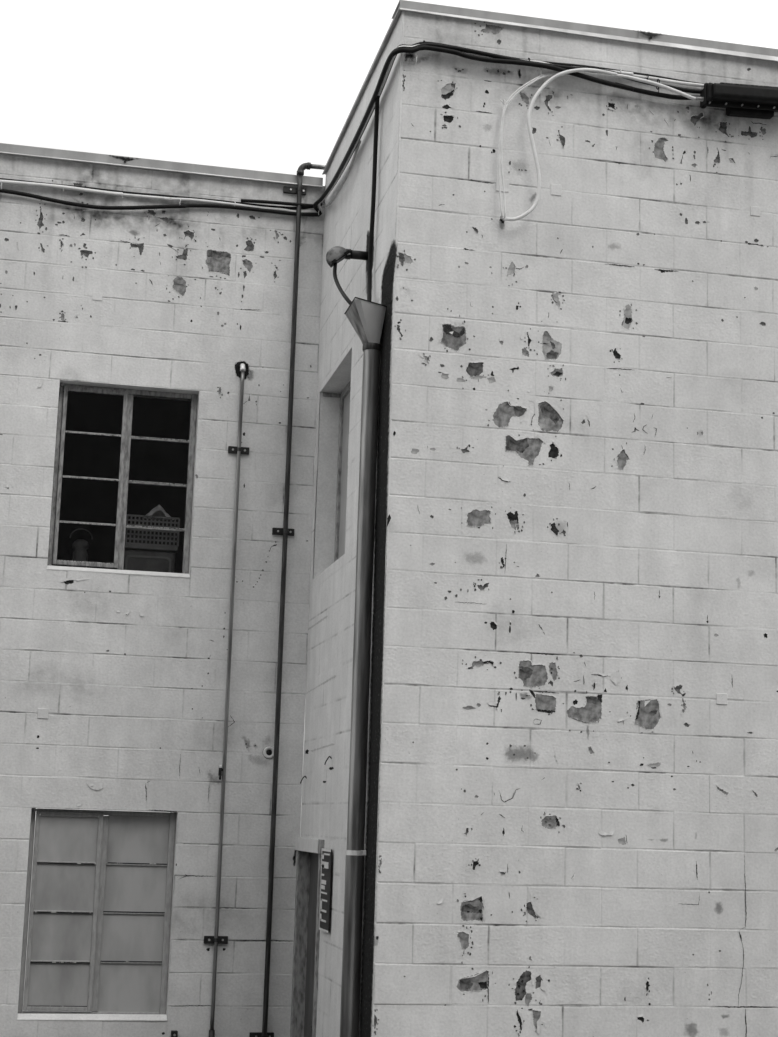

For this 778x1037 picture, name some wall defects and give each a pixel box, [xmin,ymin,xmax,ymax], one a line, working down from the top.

peeling [147,209,281,302]
peeling [551,291,565,310]
peeling [419,308,496,390]
peeling [485,321,566,466]
peeling [449,507,525,533]
peeling [462,656,628,733]
peeling [627,685,689,733]
peeling [509,893,542,922]
peeling [457,893,496,1002]
peeling [509,966,550,1037]